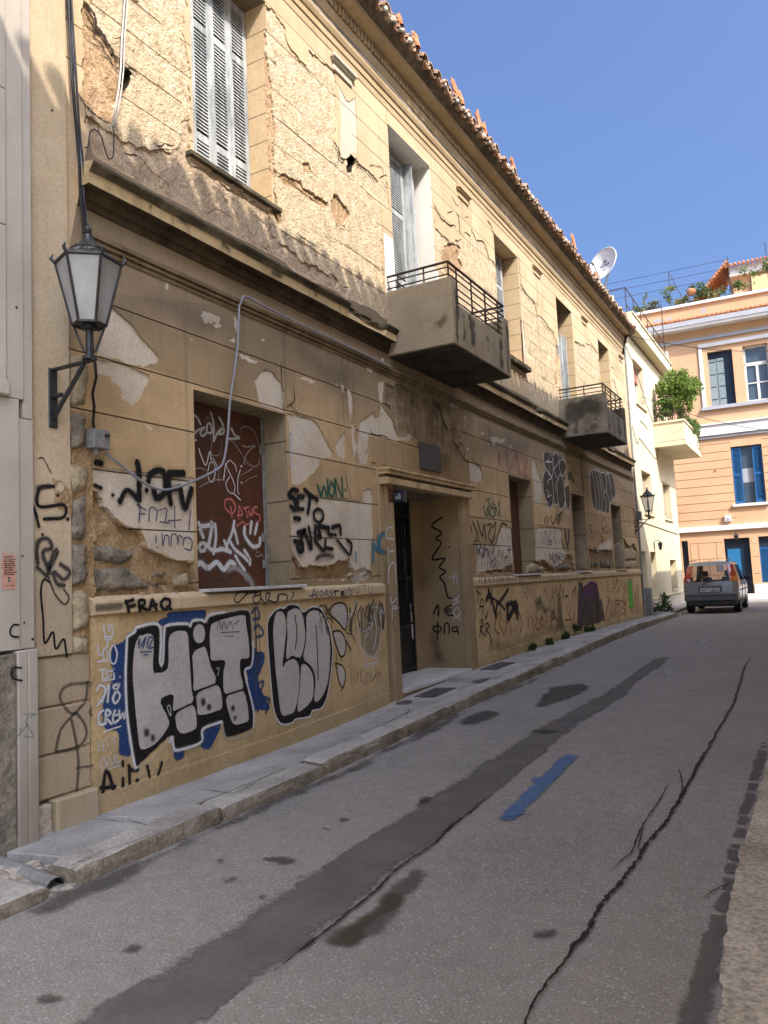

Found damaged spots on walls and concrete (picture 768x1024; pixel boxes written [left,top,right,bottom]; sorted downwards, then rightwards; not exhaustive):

peeling [81,0,388,319]
peeling [95,308,158,405]
peeling [201,311,221,328]
spalling [93,468,194,597]
peeling [240,354,482,583]